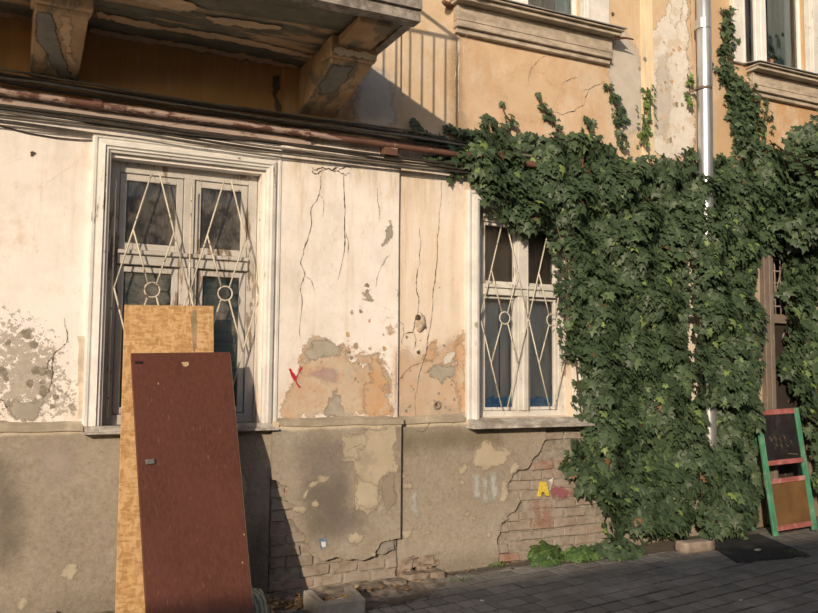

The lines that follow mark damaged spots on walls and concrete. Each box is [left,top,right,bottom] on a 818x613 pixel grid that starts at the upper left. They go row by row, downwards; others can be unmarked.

peeling [35,11,77,80]
peeling [89,0,314,69]
peeling [607,0,696,160]
crack [299,166,352,334]
crack [397,227,439,432]
spalling [0,398,45,422]
peeling [66,336,85,419]
peeling [280,330,465,517]
spalling [269,475,332,522]
spalling [458,421,707,565]
spalling [268,524,445,592]